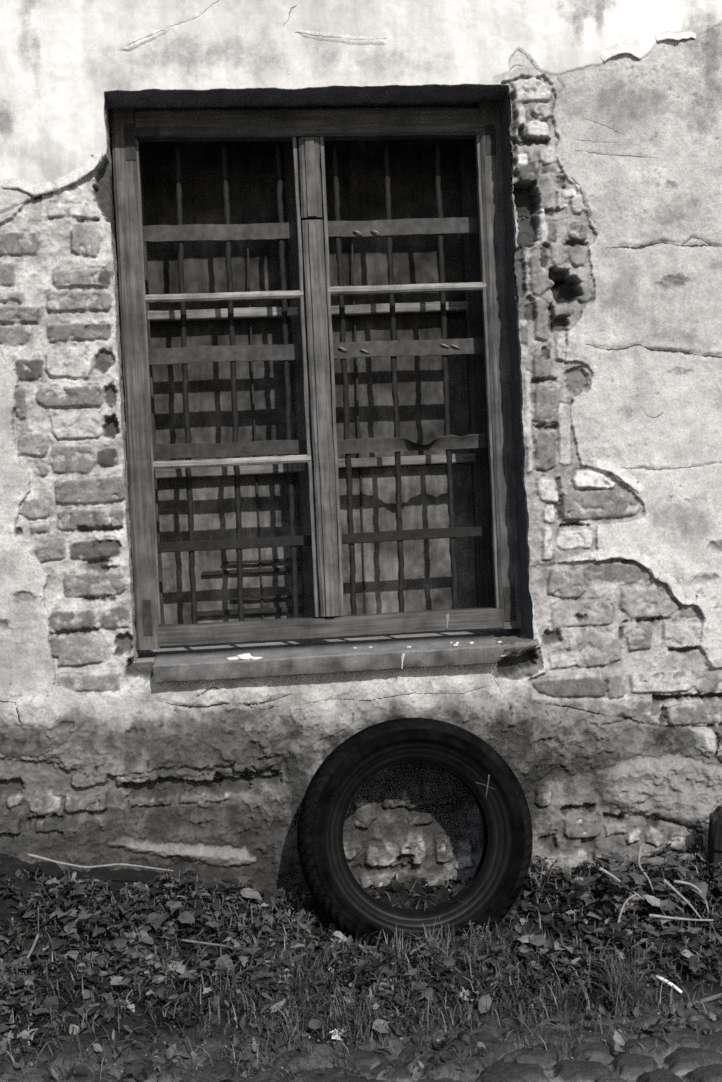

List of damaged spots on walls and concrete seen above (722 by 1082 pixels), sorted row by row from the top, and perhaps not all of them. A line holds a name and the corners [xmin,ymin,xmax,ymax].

peeling [599,43,645,62]
crack [586,344,722,358]
flaking render [492,74,722,729]
flaking render [0,149,153,695]
crack [622,462,722,470]
flaking render [124,726,146,738]
flaking render [532,735,563,749]
flaking render [0,754,291,844]
flaking render [526,768,702,870]